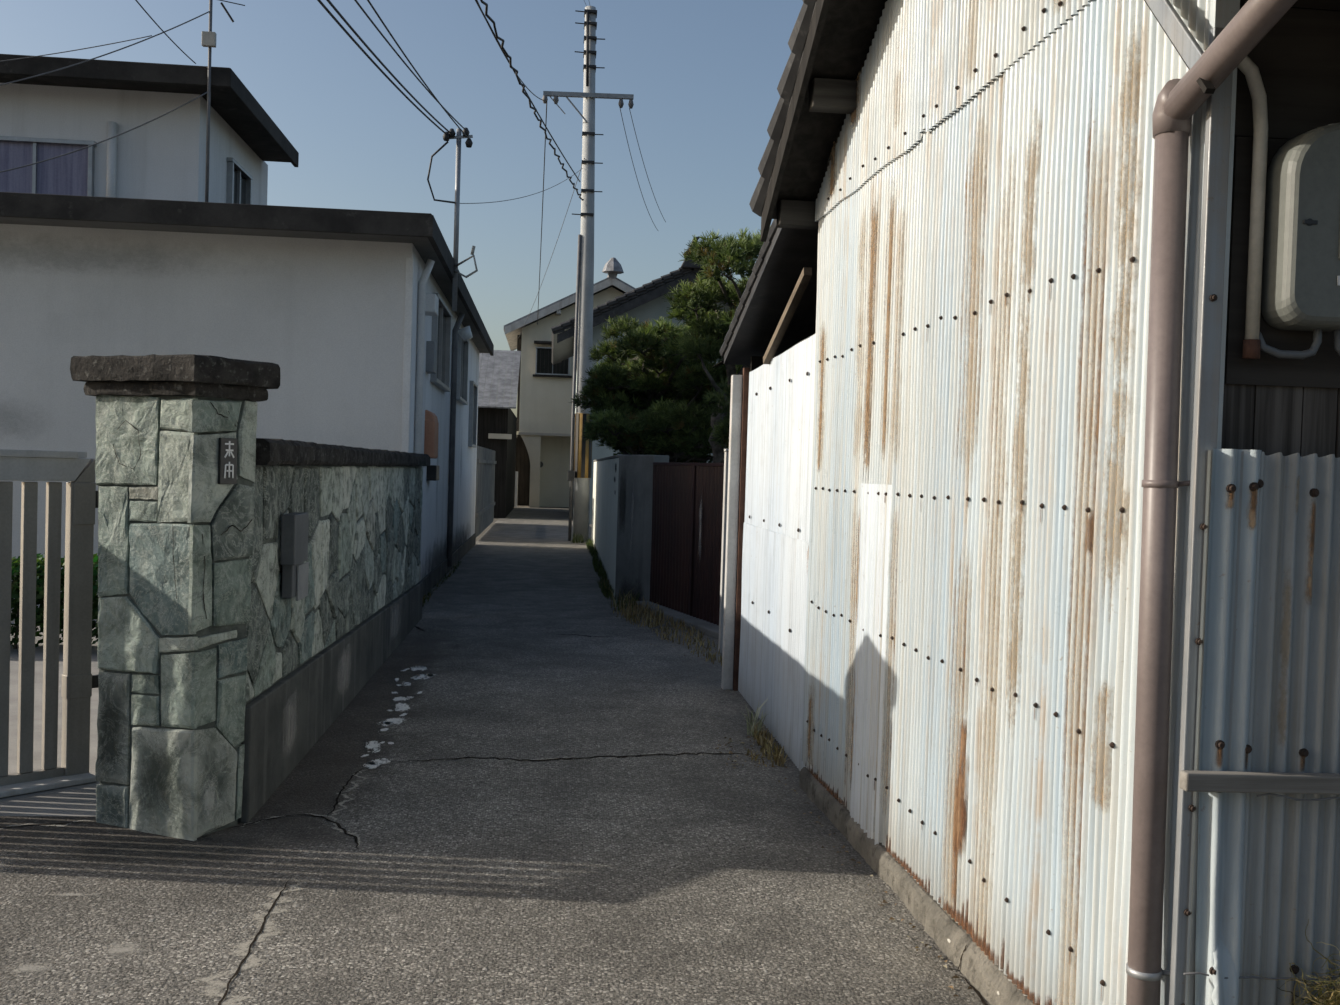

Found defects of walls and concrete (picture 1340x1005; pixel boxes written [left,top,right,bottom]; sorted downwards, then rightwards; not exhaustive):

rust [859,210,904,465]
rust [852,519,860,620]
rust [886,133,1078,1005]
rust [1065,124,1107,899]
crack [229,769,368,849]
crack [405,752,748,762]
rust [807,674,855,807]
crack [198,876,302,1005]
crack [956,945,987,1005]